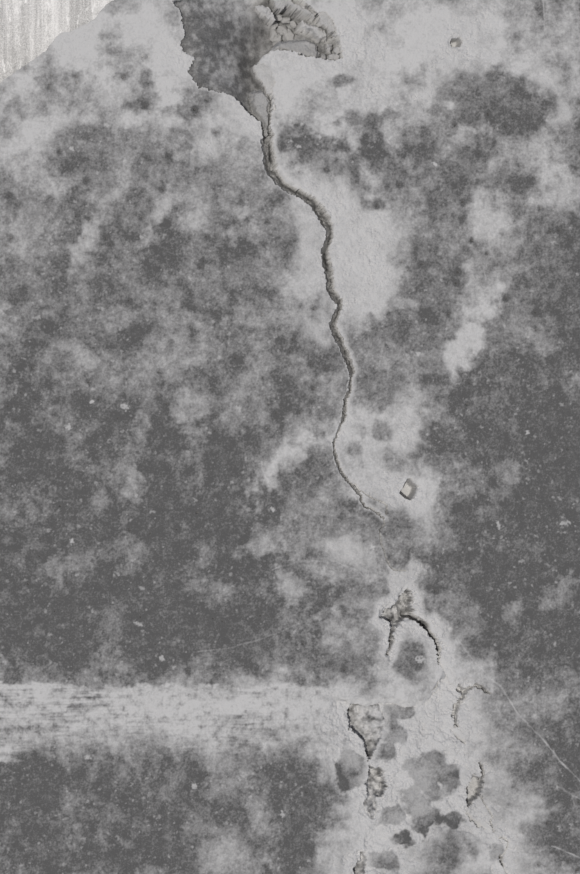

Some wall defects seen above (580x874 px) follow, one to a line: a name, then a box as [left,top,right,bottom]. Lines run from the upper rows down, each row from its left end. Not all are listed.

crack [260,138,492,744]
spalling [362,407,429,519]
spalling [325,556,557,874]
crack [465,762,510,874]